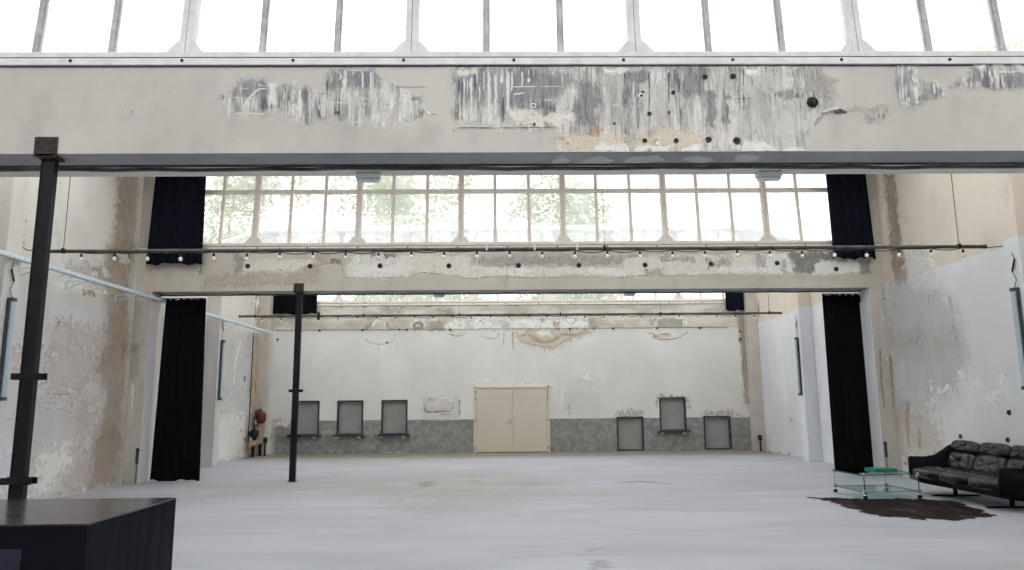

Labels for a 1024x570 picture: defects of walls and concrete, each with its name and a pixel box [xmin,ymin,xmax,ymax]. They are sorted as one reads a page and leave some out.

peeling [269,82,278,105]
spalling [815,107,847,125]
peeling [551,128,716,164]
peeling [732,154,760,162]
damp [886,175,906,283]
peeling [242,253,793,279]
damp [90,177,137,487]